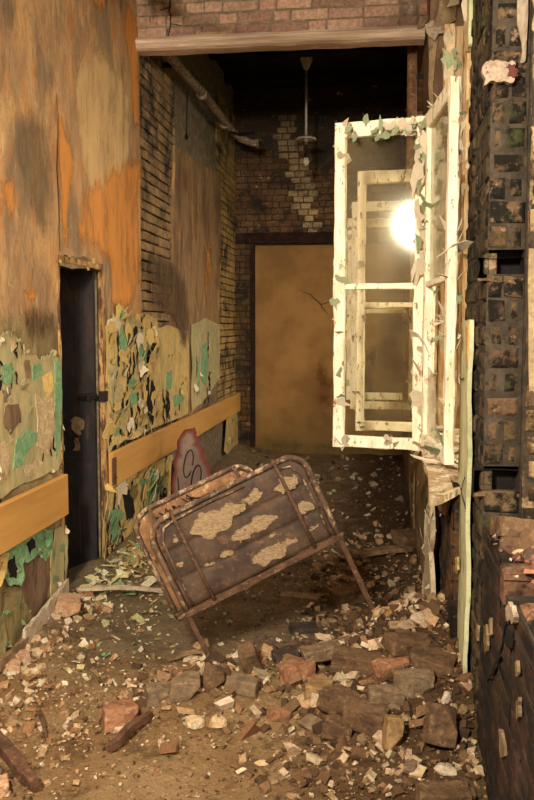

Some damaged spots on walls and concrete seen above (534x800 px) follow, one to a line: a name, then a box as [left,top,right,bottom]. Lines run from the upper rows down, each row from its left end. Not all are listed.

peeling [0,328,84,503]